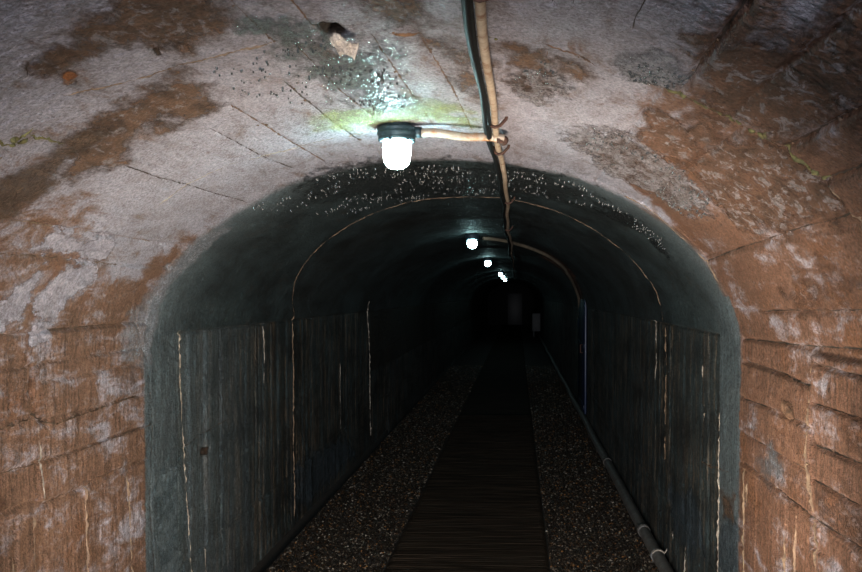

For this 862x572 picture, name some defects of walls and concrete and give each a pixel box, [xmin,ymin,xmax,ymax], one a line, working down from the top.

spalling [316,21,358,60]
water stain [505,68,575,107]
crack [0,128,64,159]
water stain [558,124,716,221]
crack [625,0,862,291]
crack [0,252,117,265]
crack [0,313,153,533]
crack [177,333,224,571]
crack [702,338,862,548]